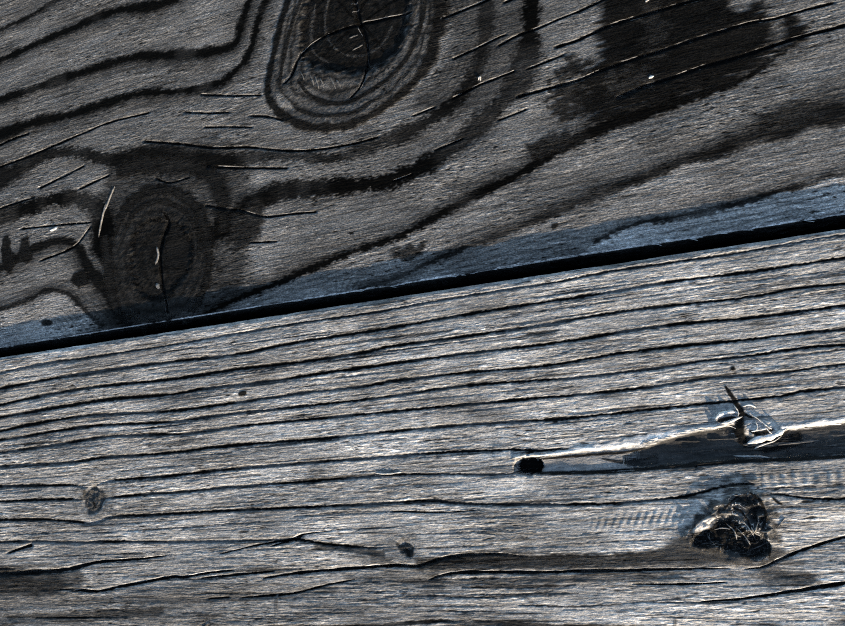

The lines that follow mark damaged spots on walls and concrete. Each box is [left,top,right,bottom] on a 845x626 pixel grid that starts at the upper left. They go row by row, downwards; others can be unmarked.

damp [526,0,808,160]
crack [0,530,845,602]